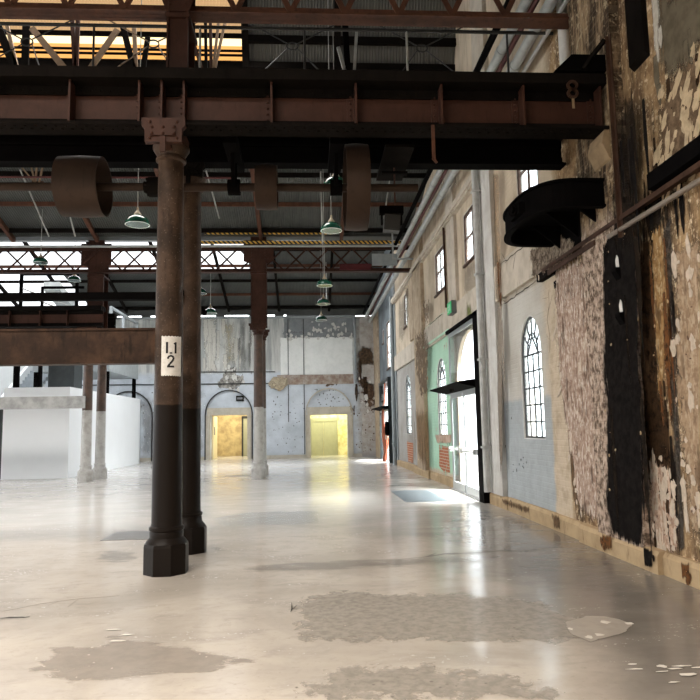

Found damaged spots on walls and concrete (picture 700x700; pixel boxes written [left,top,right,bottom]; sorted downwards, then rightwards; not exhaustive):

peeling [653,42,700,168]
peeling [283,321,353,341]
peeling [357,377,375,416]
peeling [649,234,700,553]